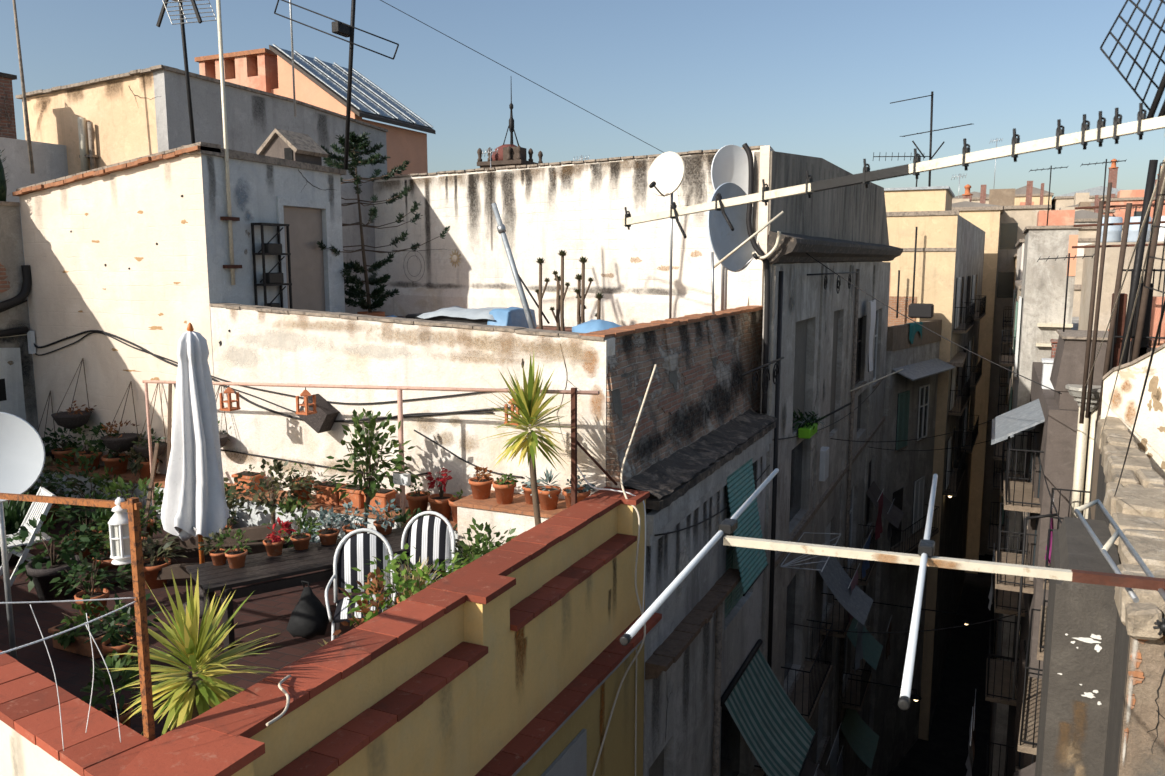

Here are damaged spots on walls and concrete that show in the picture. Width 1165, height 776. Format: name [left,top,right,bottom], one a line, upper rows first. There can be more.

leakage [682,153,716,204]
leakage [378,159,655,256]
leakage [636,362,746,458]
peeling [1147,376,1163,412]
peeling [1137,438,1165,469]
peeling [1065,633,1102,652]
crack [1148,639,1165,754]